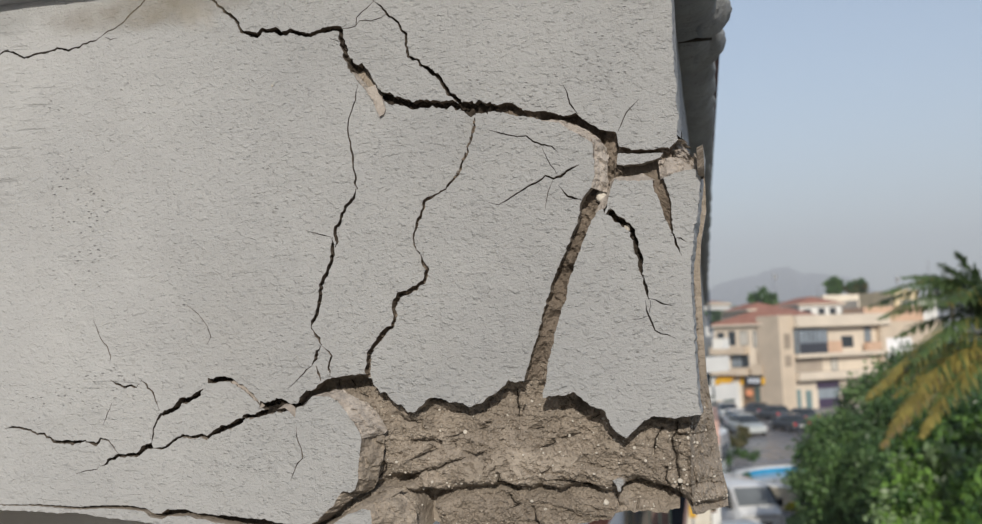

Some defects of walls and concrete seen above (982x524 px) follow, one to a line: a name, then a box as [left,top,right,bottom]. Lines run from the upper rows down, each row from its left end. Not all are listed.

crack [5,30,116,59]
crack [212,0,702,400]
crack [10,376,302,474]
spalling [304,361,729,524]
flaking render [0,504,251,524]
crack [162,509,283,524]